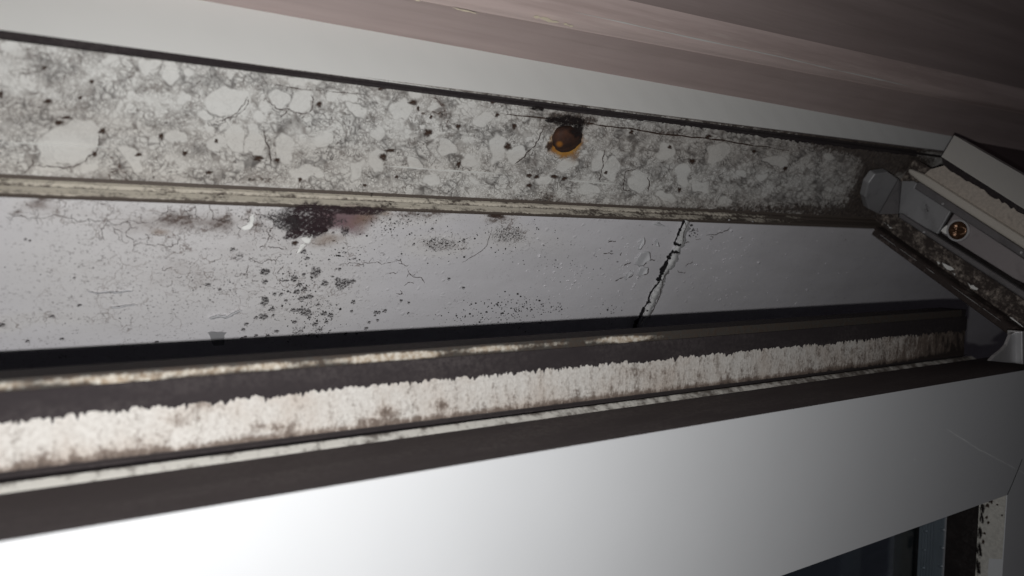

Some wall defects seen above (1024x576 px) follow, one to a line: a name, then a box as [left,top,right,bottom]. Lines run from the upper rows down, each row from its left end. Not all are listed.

corrosion [546,142,582,158]
damp [215,184,539,342]
damp [435,287,563,332]
crack [633,220,729,328]
damp [0,330,965,472]
damp [976,501,1003,574]